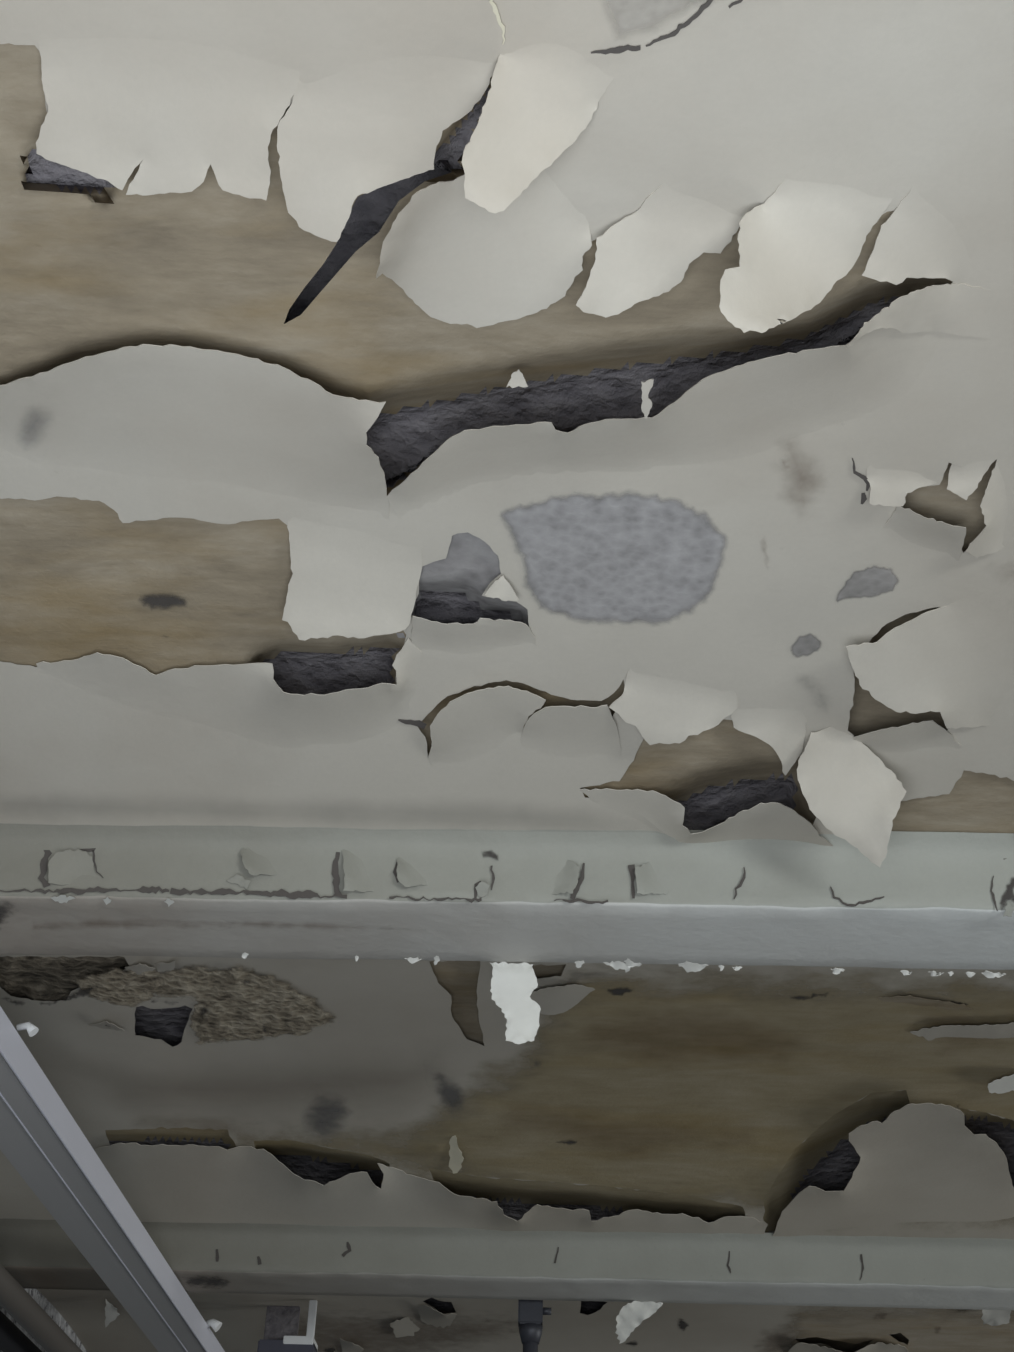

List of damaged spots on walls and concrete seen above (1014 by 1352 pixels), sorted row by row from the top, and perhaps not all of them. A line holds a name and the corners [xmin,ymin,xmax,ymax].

peeling [0,38,997,520]
peeling [866,460,1008,560]
peeling [0,494,725,748]
peeling [418,598,1014,867]
crack [38,848,104,888]
crack [332,850,375,897]
crack [551,859,585,899]
crack [628,862,668,898]
crack [734,867,746,899]
crack [830,887,884,907]
spalling [0,953,335,1047]
peeling [94,956,1014,1237]